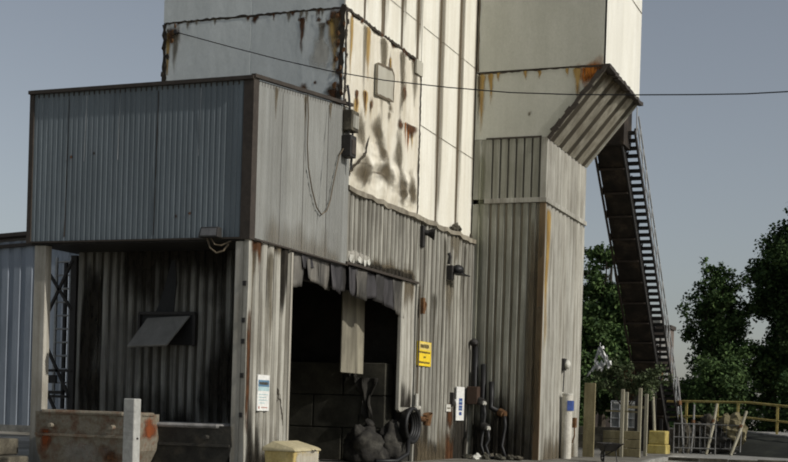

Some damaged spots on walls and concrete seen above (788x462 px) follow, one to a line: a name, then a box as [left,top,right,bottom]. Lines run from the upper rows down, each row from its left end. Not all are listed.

corrosion [164,6,422,214]
corrosion [478,62,625,119]
water stain [356,117,417,202]
peeling [348,251,370,266]
corrosion [525,210,551,427]